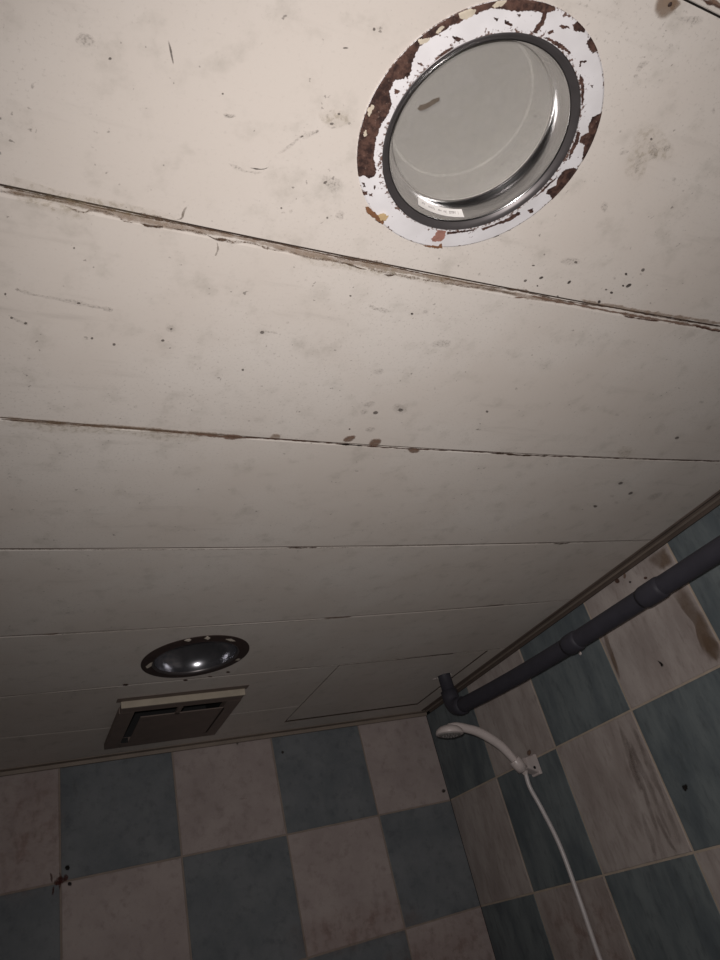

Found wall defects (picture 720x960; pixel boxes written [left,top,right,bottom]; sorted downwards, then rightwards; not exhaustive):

rust [357,0,598,224]